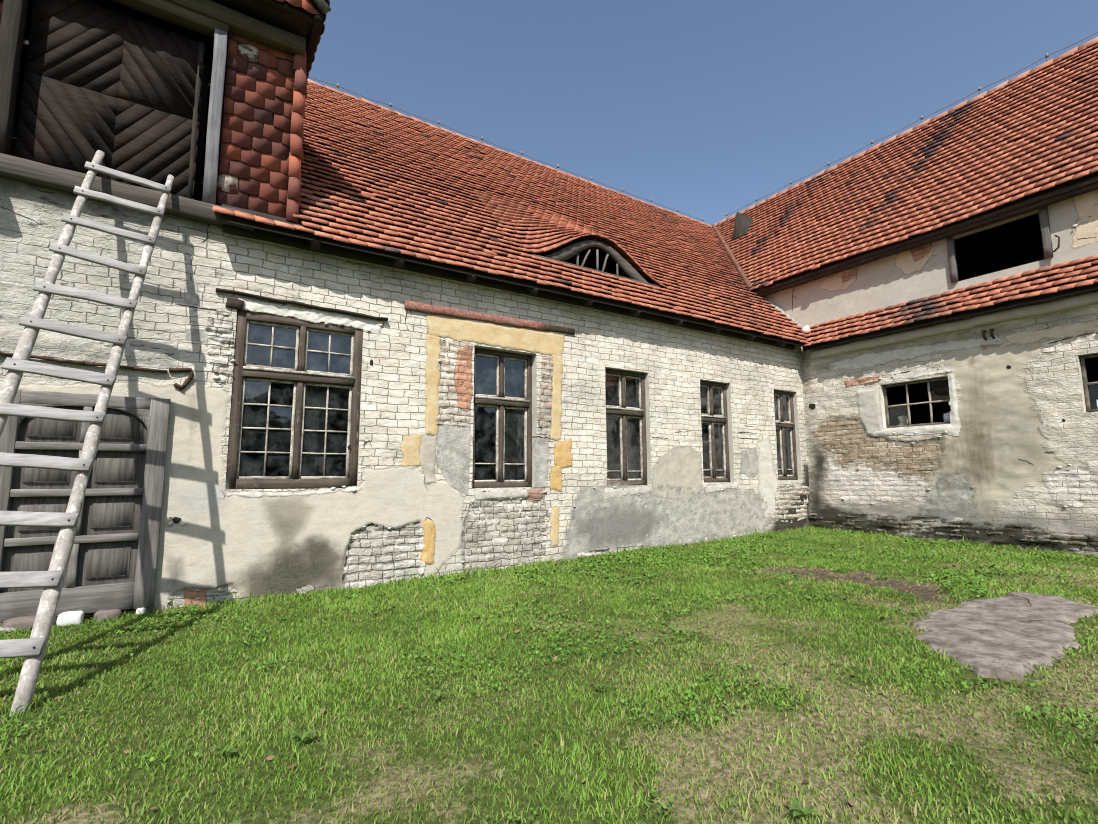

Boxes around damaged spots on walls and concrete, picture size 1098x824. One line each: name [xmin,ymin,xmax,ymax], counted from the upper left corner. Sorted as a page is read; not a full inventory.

peeling [1072,190,1098,248]
flaking render [436,339,473,426]
flaking render [772,416,1098,556]
leakage [584,510,654,545]
leakage [821,508,1098,533]
leakage [251,544,340,600]
spalling [292,522,425,596]